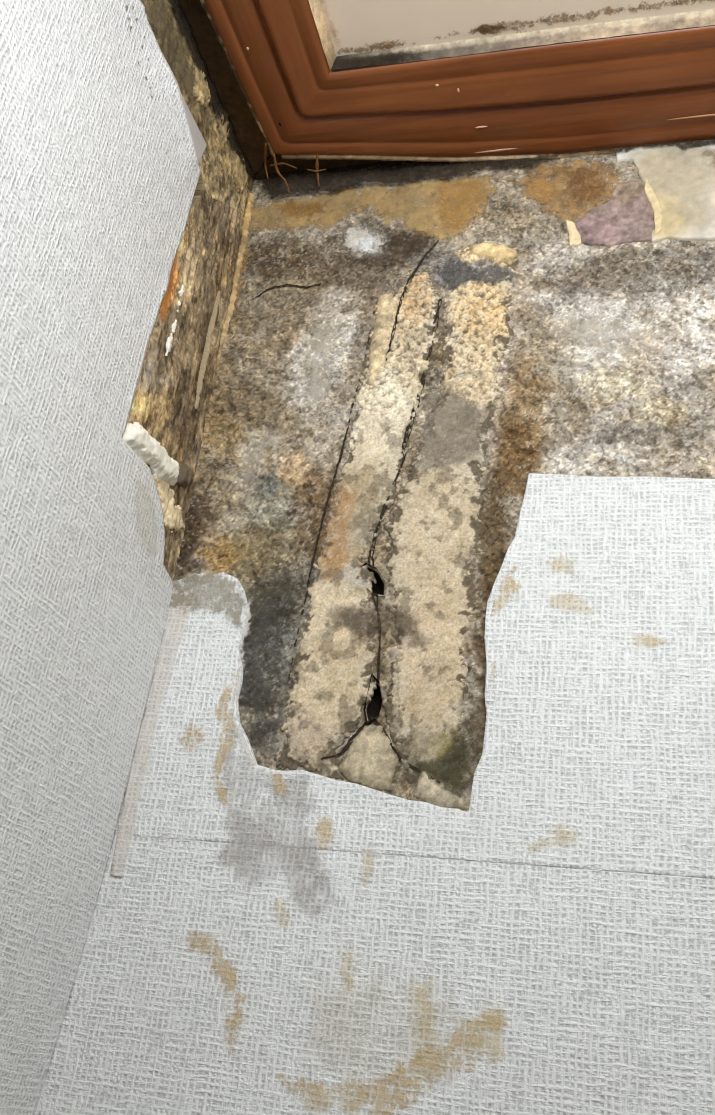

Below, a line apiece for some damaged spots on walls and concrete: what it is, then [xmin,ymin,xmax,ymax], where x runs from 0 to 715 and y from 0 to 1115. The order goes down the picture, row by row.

water stain [126,0,715,197]
peeling [128,0,715,812]
crack [288,240,442,783]
water stain [416,713,478,796]
water stain [191,935,245,1040]
water stain [345,1012,502,1115]